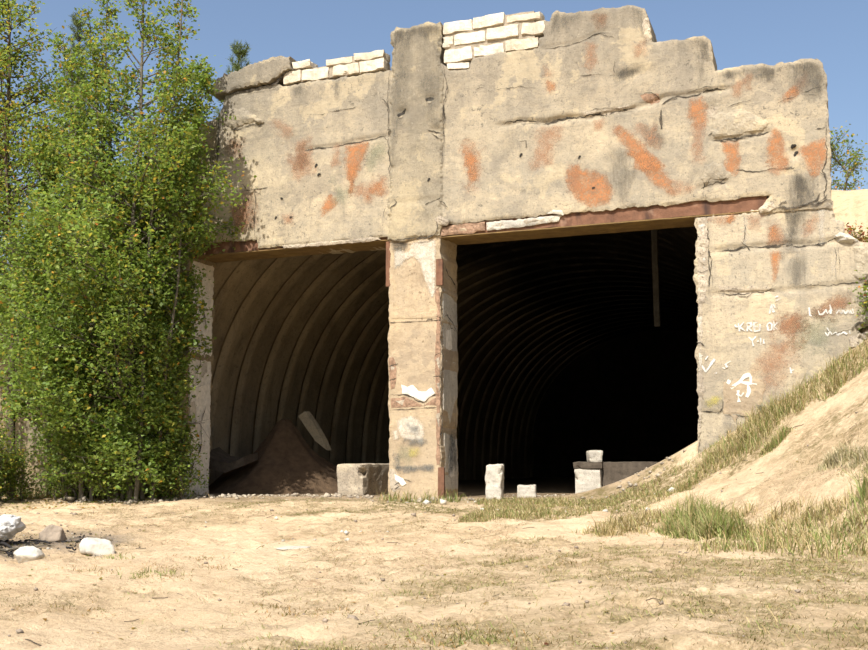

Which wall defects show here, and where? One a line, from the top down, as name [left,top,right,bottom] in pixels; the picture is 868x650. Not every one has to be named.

crack [499,86,750,129]
corrosion [347,142,384,197]
corrosion [568,166,612,206]
corrosion [617,127,674,193]
crack [709,132,768,142]
corrosion [767,130,789,174]
corrosion [802,140,826,176]
spalling [388,210,564,505]